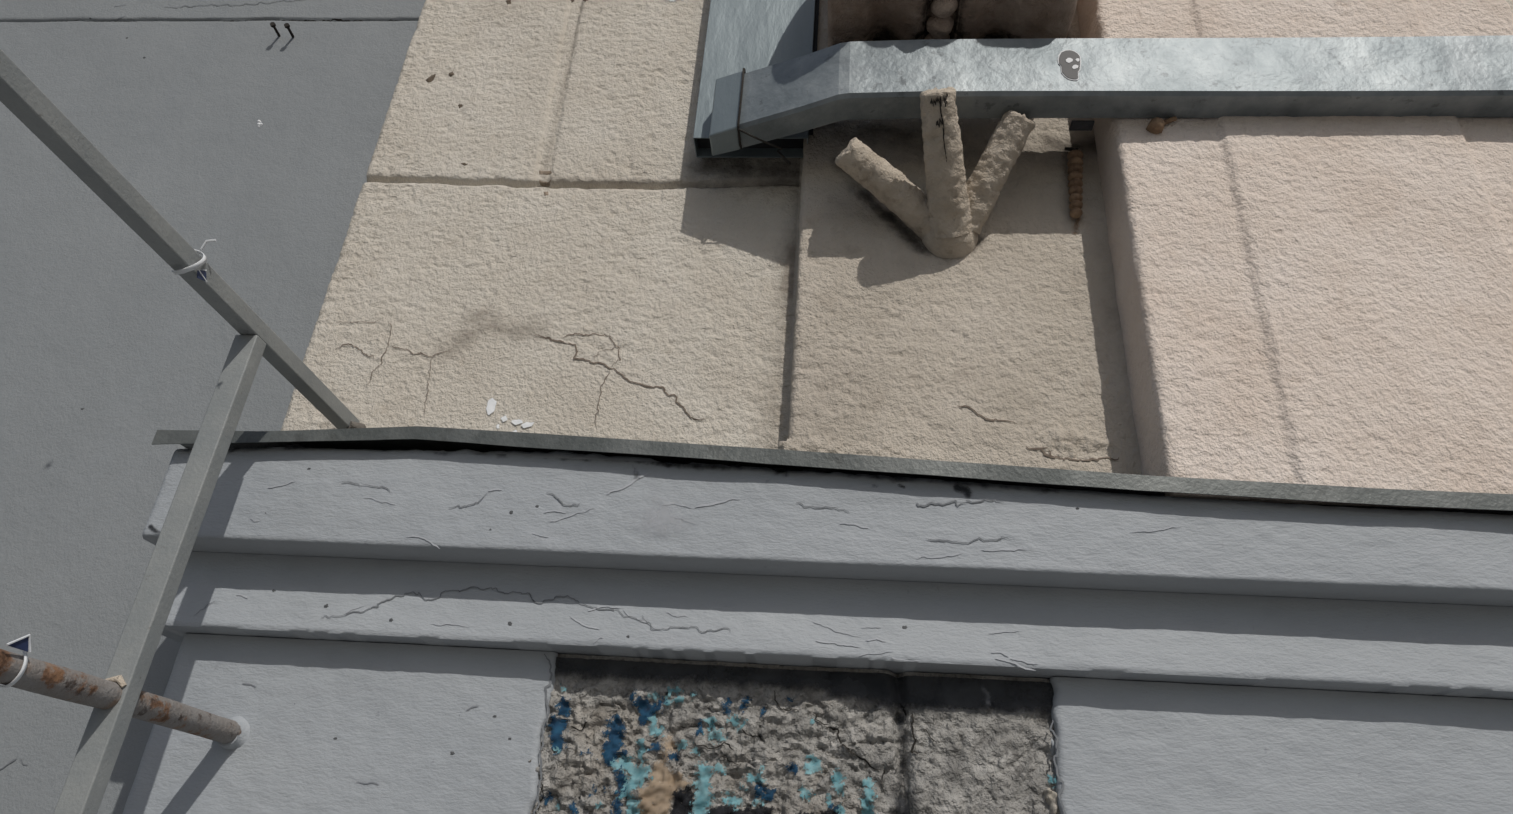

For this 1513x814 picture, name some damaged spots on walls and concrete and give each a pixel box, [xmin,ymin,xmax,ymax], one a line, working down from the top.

crack [336,321,447,419]
crack [534,333,708,428]
crack [796,502,847,511]
crack [916,498,1016,543]
crack [325,586,731,633]
spalling [528,654,1066,814]